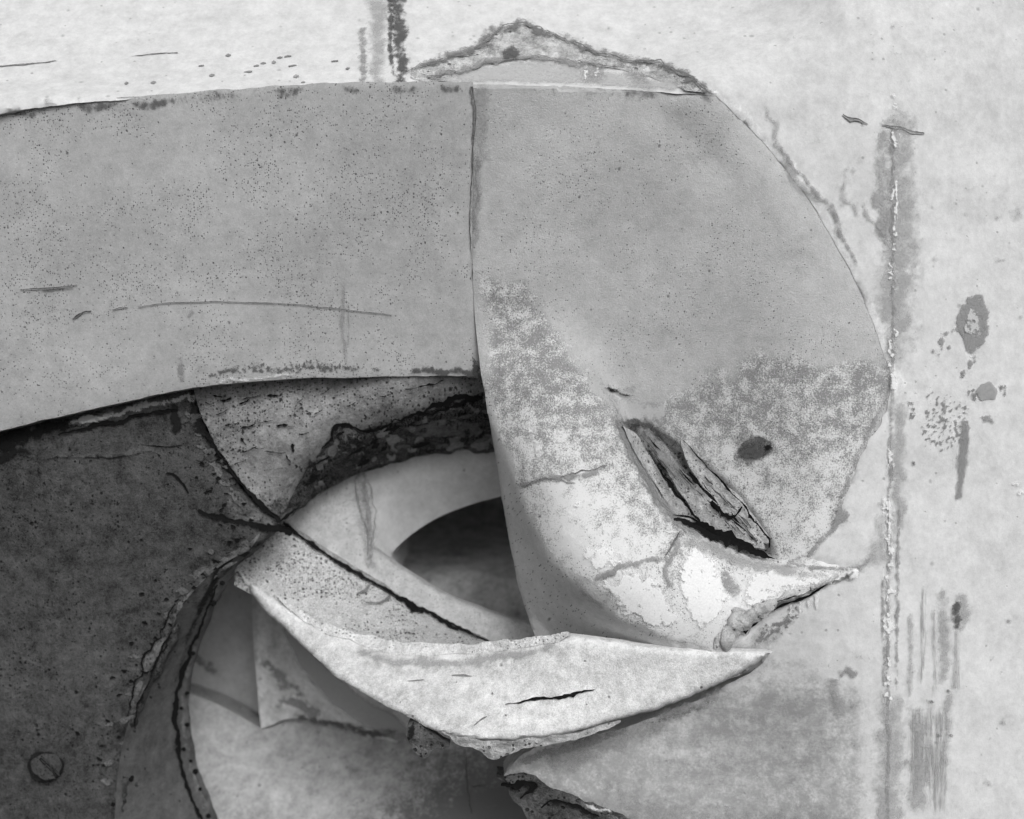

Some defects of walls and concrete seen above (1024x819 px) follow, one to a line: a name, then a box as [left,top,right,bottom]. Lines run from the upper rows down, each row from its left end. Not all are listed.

water stain [359,0,409,82]
spalling [405,18,713,95]
spalling [209,360,380,383]
spalling [412,357,480,378]
spalling [281,392,495,521]
spalling [607,387,774,559]
peeling [787,372,893,580]
water stain [771,103,970,819]
spalling [276,595,569,667]
crack [475,689,595,725]
spalling [406,718,629,819]